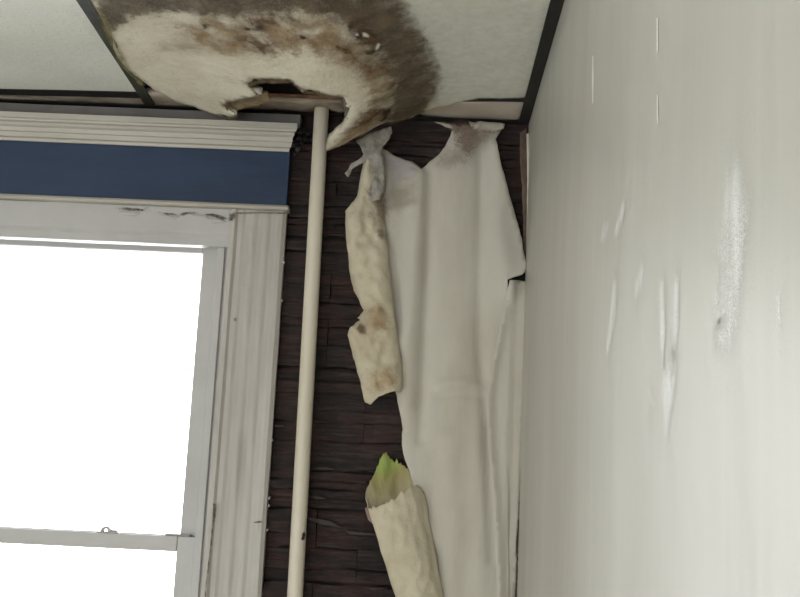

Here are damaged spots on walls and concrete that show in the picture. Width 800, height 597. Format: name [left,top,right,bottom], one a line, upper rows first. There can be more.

leakage [86,0,448,147]
spalling [292,126,309,156]